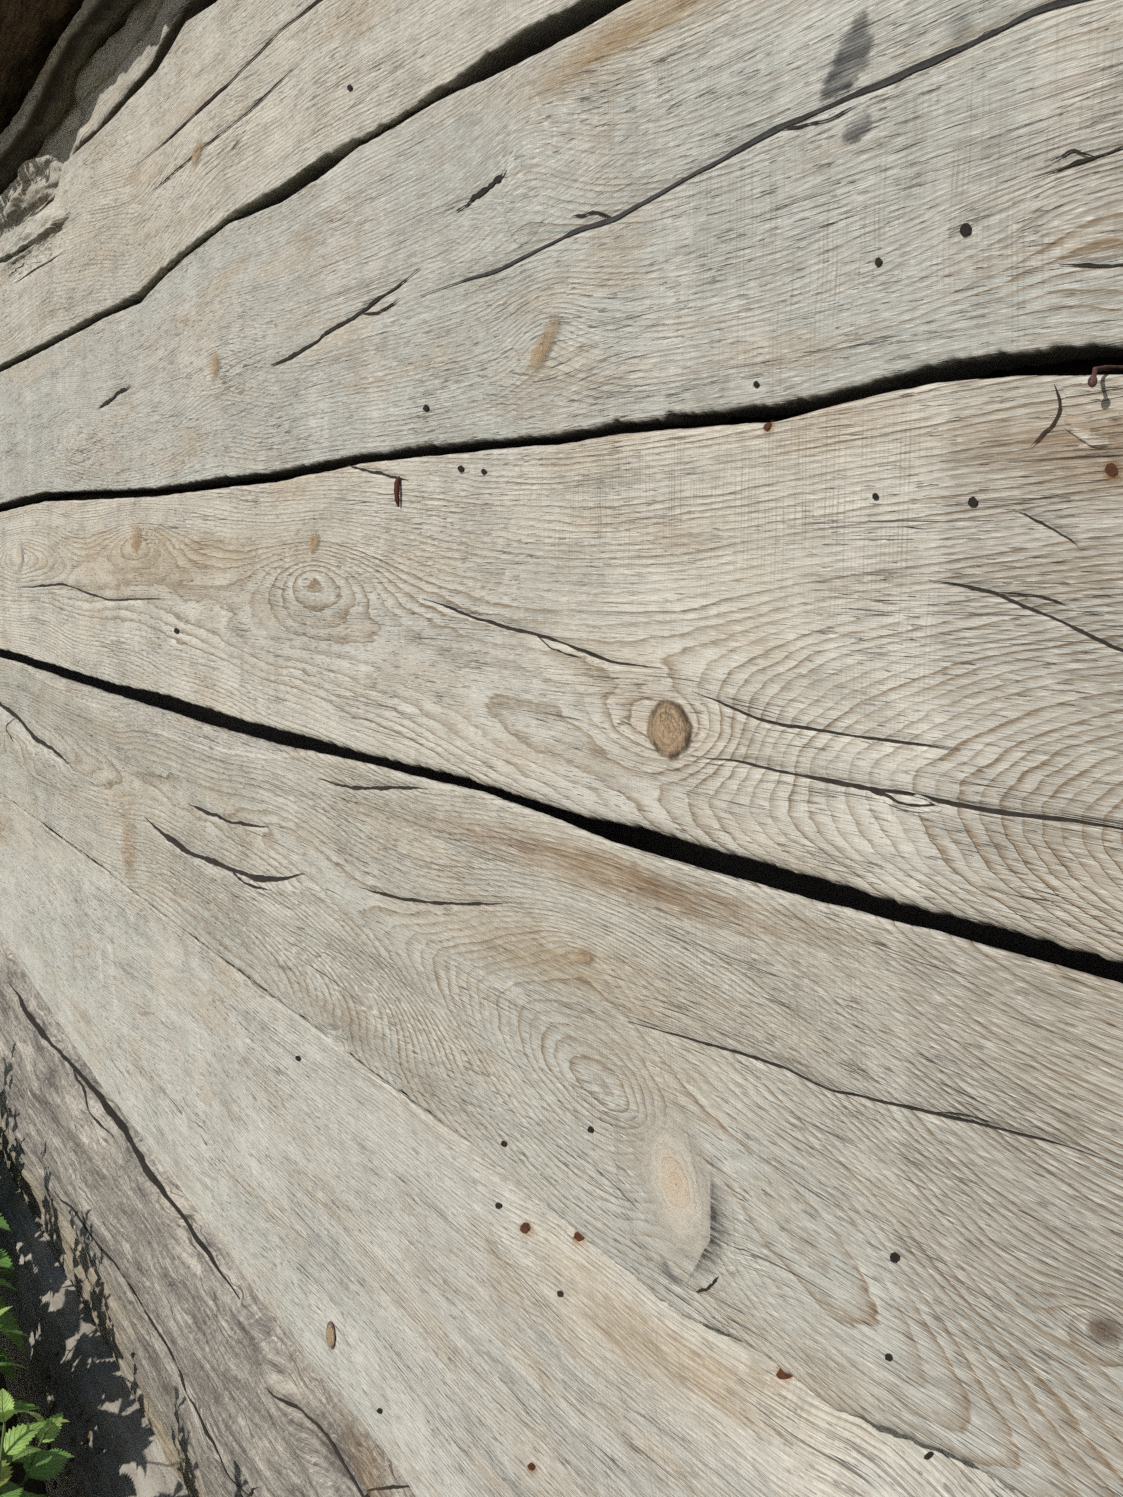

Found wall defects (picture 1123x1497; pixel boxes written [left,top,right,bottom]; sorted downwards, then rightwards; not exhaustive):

crack [271,0,1084,366]
crack [1030,384,1061,447]
crack [928,579,1123,652]
crack [0,703,67,762]
crack [691,690,960,751]
crack [691,755,1123,829]
crack [147,803,304,891]
crack [9,983,240,1299]
crack [264,1385,409,1497]